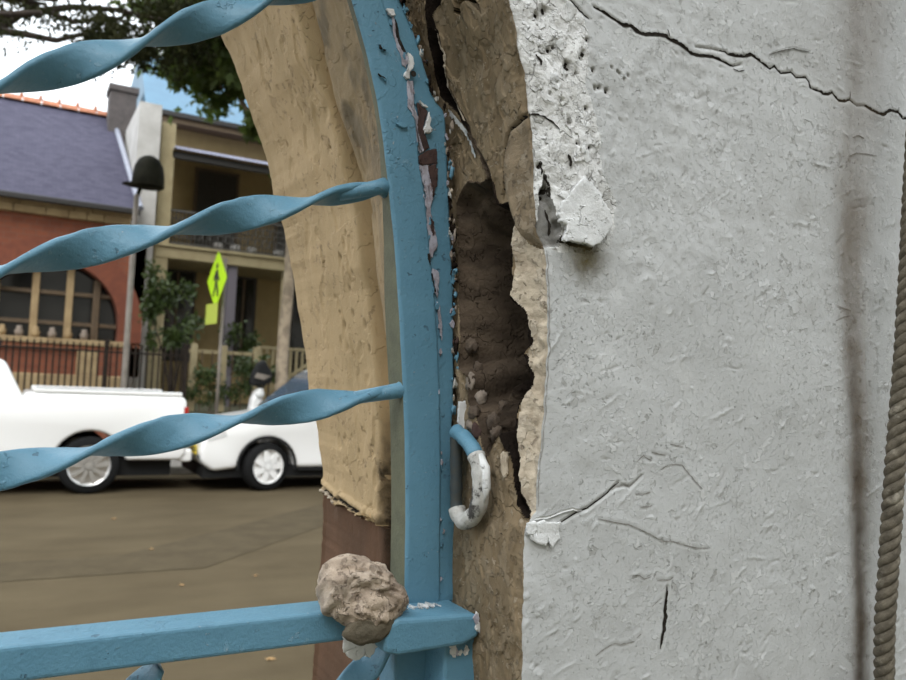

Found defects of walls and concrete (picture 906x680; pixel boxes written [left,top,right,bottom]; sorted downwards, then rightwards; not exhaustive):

crack [570,0,906,119]
spalling [378,0,616,518]
crack [525,444,706,549]
crack [596,575,673,656]